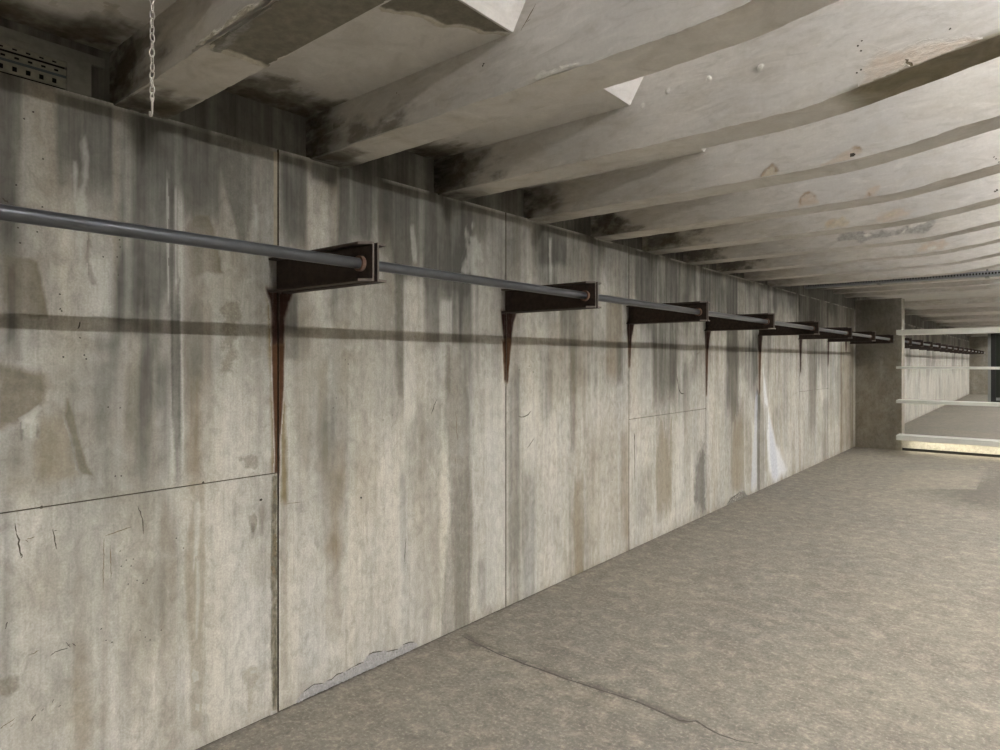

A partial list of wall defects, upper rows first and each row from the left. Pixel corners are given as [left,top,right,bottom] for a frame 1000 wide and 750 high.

water stain [0,0,205,119]
water stain [224,72,425,163]
water stain [72,131,92,217]
water stain [405,137,510,194]
peeling [835,202,952,254]
rust [264,283,293,509]
rust [500,307,518,386]
rust [627,316,635,370]
rust [704,324,712,398]
water stain [727,330,788,501]
spalling [295,640,419,704]
crack [462,632,758,744]